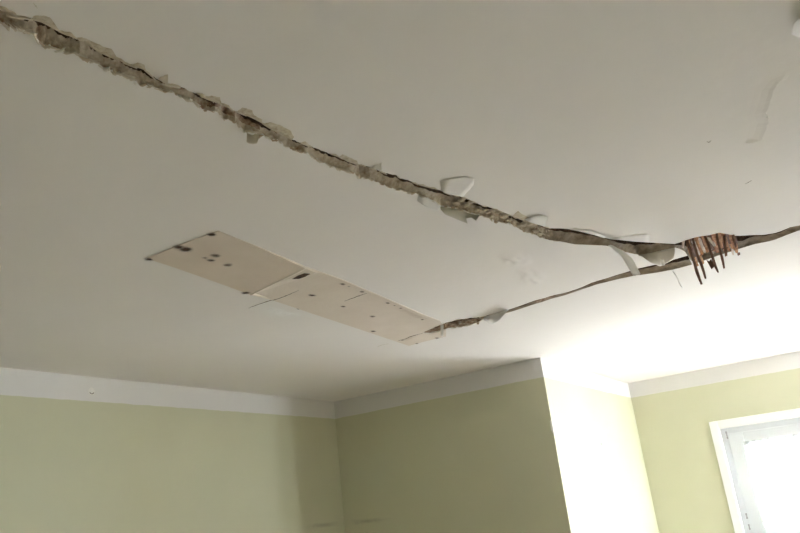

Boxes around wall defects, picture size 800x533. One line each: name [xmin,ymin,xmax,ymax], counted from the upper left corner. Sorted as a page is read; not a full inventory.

crack [0,6,800,341]
peeling [440,176,474,197]
peeling [417,196,480,223]
peeling [524,215,548,226]
peeling [570,228,675,275]